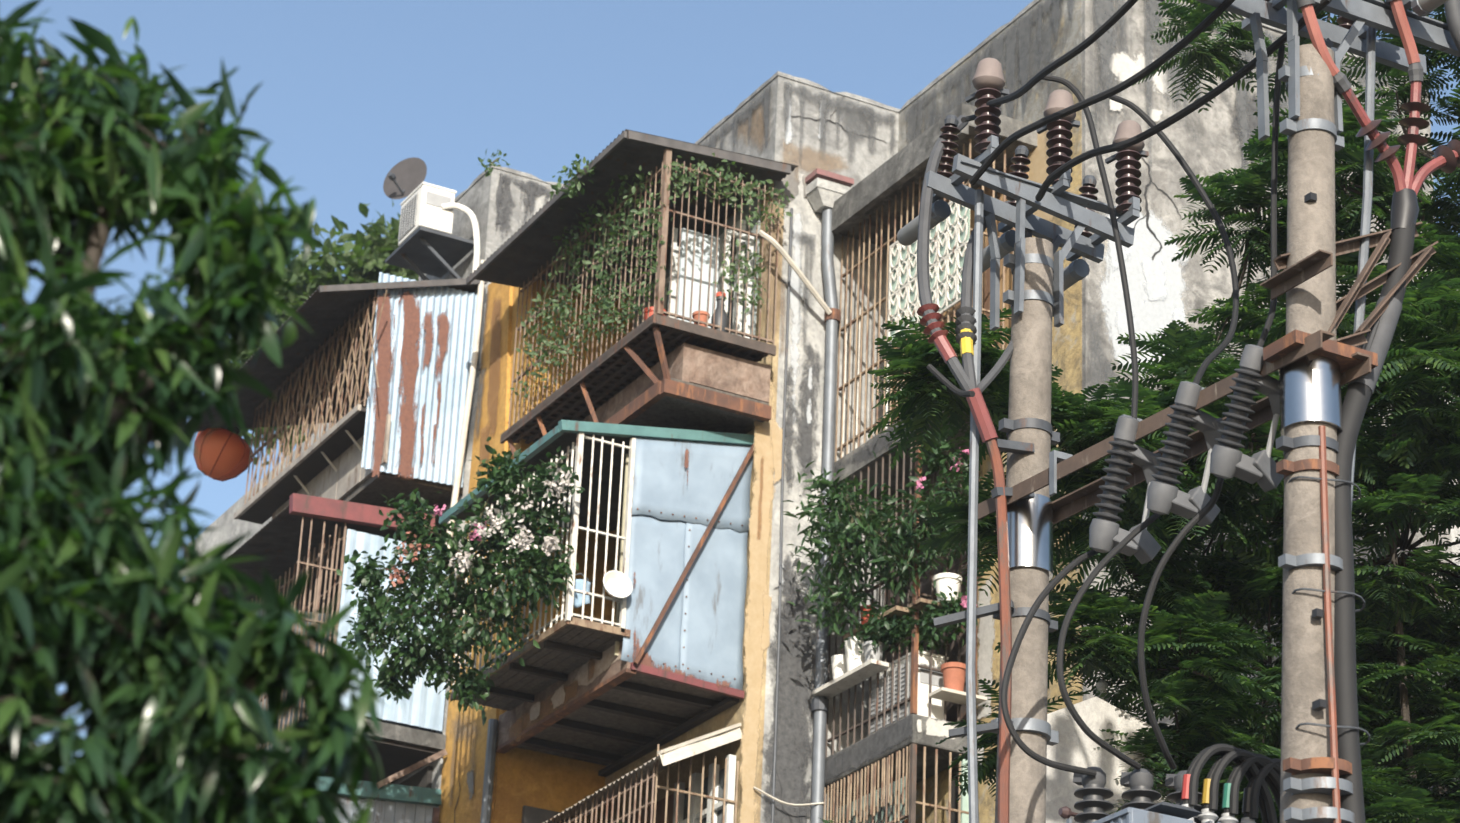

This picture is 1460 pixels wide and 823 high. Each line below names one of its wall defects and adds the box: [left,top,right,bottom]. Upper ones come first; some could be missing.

damp [699,0,1074,170]
damp [1094,0,1288,170]
damp [1340,59,1398,136]
rust [372,290,451,480]
damp [763,198,821,496]
damp [835,418,912,476]
rust [633,630,695,678]
damp [763,546,913,823]